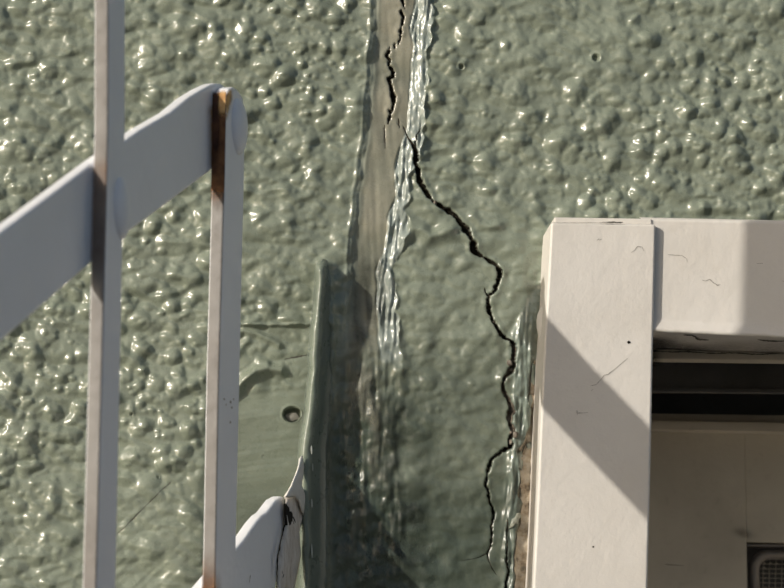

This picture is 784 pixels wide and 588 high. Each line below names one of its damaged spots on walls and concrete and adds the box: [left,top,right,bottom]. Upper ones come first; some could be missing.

corrosion [211,91,232,197]
crack [384,0,518,588]
peeling [277,456,305,588]
peeling [508,360,536,588]